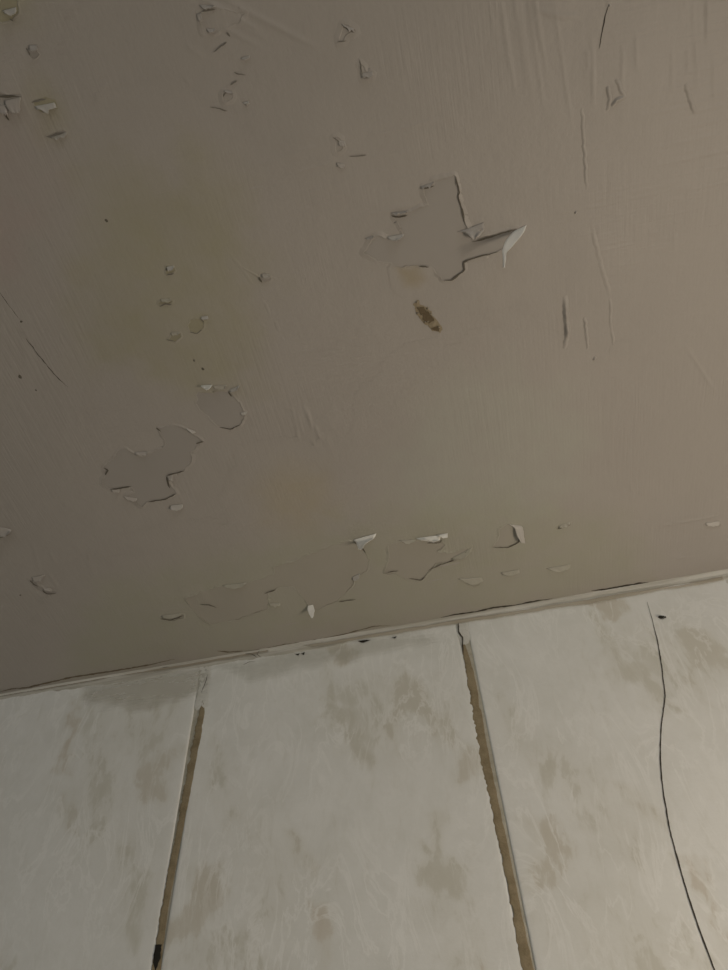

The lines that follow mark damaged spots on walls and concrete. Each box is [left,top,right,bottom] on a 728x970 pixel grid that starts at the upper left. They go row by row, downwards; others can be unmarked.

peeling [0,90,58,120]
peeling [359,171,526,283]
peeling [492,522,525,548]
crack [592,582,715,970]